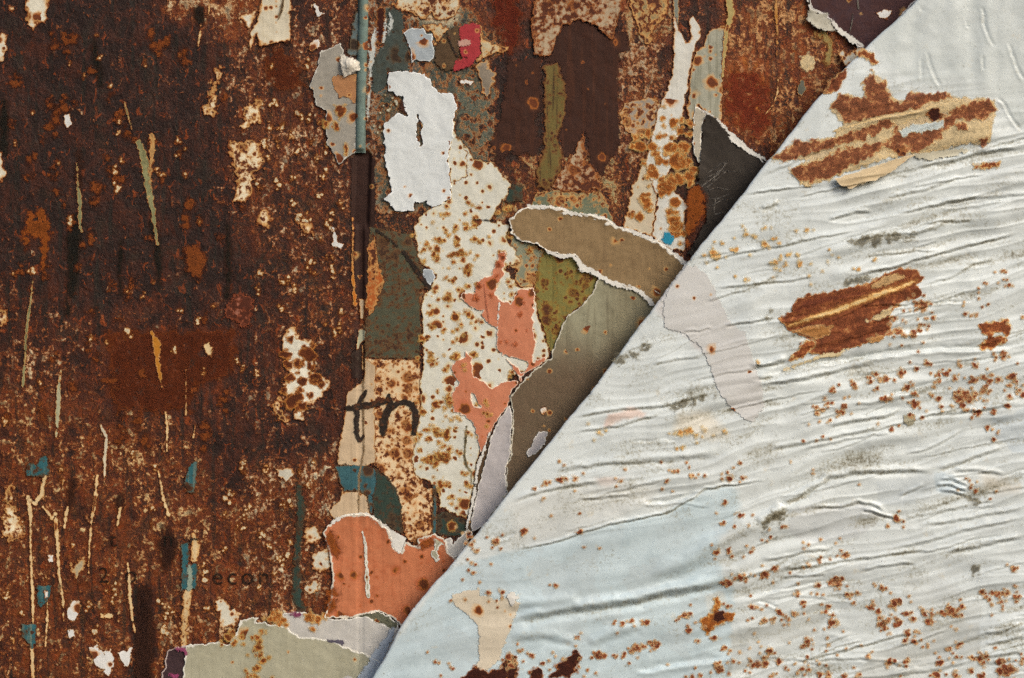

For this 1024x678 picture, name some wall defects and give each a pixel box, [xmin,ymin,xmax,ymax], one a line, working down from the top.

peeling [303,38,321,71]
peeling [371,0,509,212]
peeling [531,0,729,252]
corrosion [772,30,1001,188]
corrosion [279,335,325,412]
peeling [270,326,334,423]
peeling [289,198,345,279]
corrosion [416,201,494,372]
peeling [508,236,545,288]
corrosion [703,225,1024,442]
corrosion [415,390,492,509]
corrosion [675,564,1024,678]